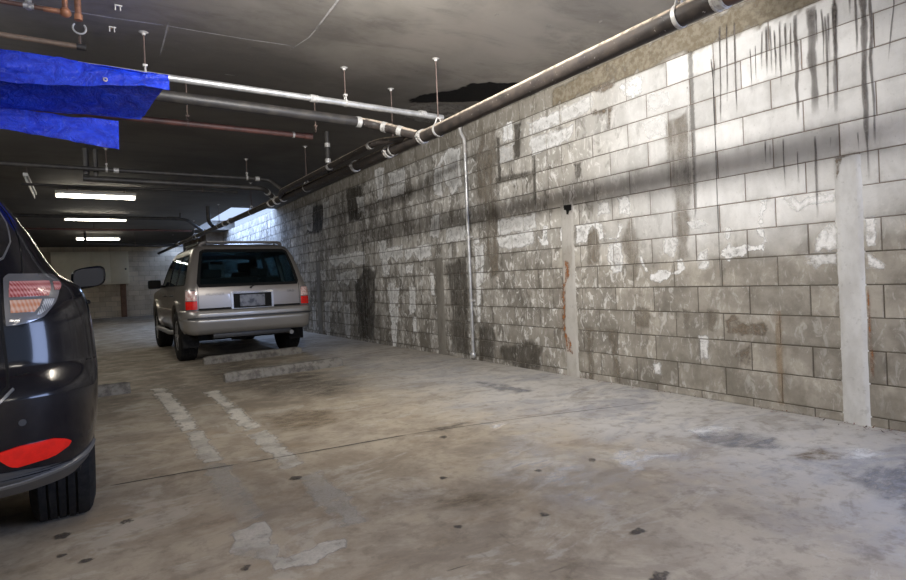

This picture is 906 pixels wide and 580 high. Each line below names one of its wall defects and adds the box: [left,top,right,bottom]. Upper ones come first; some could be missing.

crack [70,0,339,51]
spalling [405,82,519,123]
water stain [849,0,875,157]
water stain [312,0,837,368]
water stain [866,218,884,269]
corrosion [562,261,573,354]